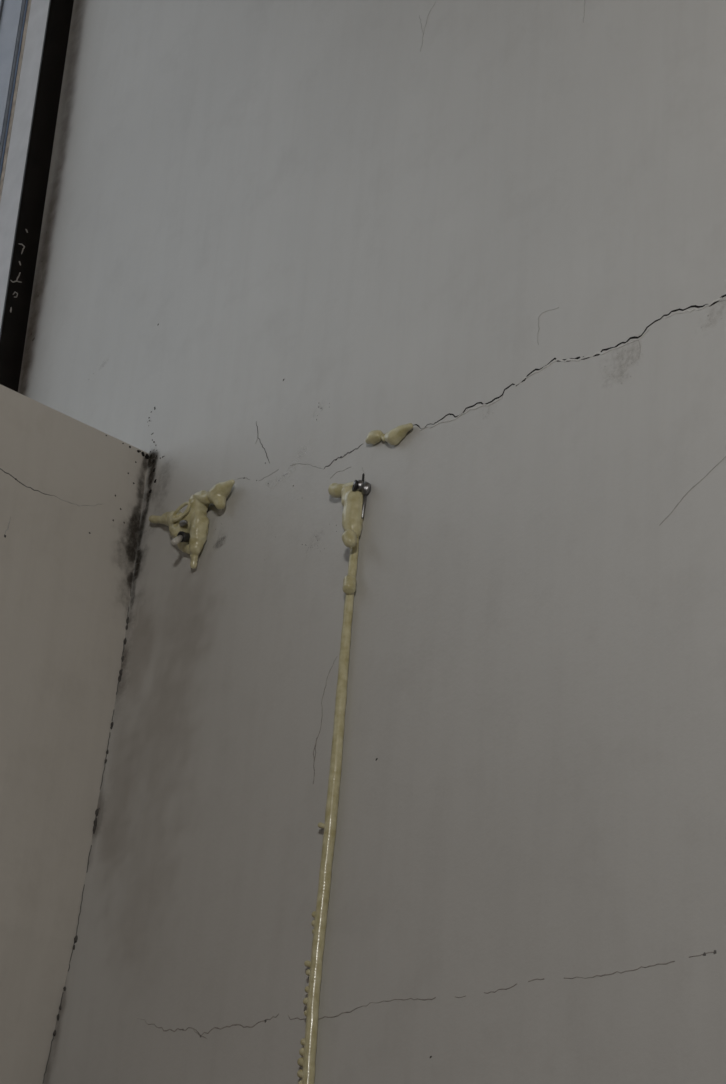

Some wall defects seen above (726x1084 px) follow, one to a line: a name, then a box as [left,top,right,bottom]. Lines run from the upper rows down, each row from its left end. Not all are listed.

crack [414,294,726,431]
crack [238,425,364,486]
crack [138,950,716,1039]